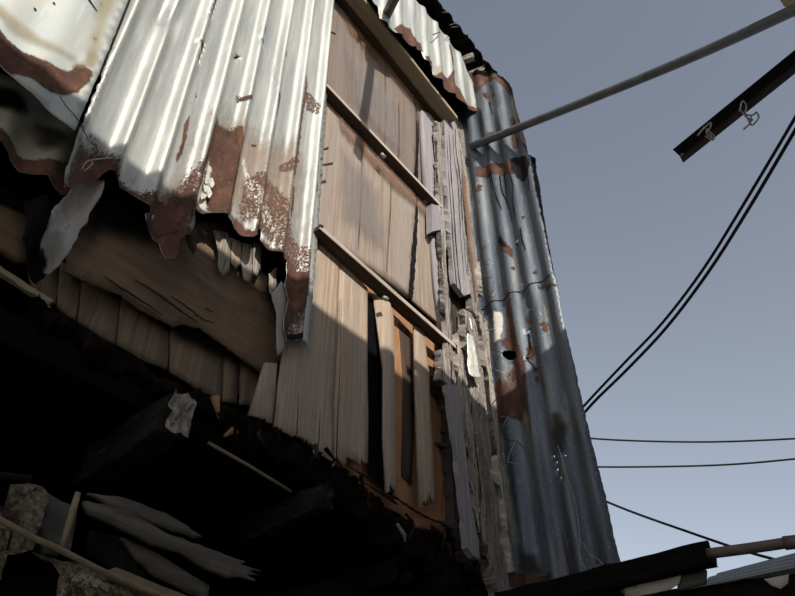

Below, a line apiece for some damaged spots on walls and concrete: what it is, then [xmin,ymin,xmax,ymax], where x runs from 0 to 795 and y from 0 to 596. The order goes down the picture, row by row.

corrosion [0,30,95,95]
corrosion [279,75,321,174]
corrosion [394,24,477,111]
corrosion [468,73,530,220]
corrosion [0,116,311,341]
corrosion [495,293,539,431]